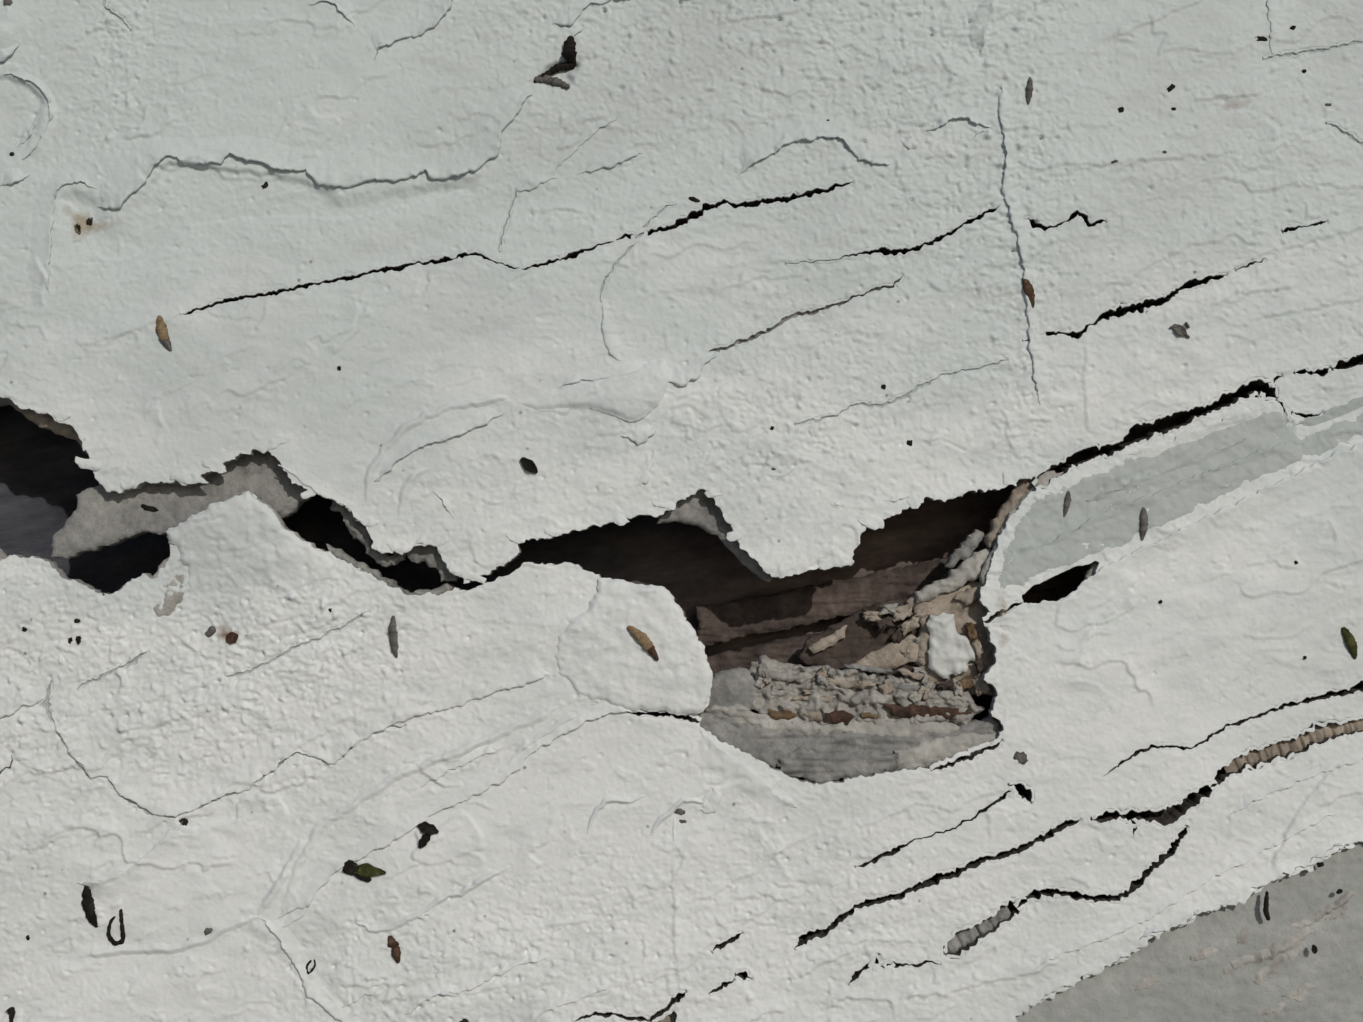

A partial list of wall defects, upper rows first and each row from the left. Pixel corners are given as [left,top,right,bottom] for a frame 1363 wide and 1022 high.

crack [180,179,853,318]
crack [706,204,1106,354]
crack [795,218,1328,427]
peeling [0,397,102,471]
peeling [170,457,227,484]
peeling [254,438,379,527]
peeling [651,487,797,583]
peeling [992,397,1363,632]
crack [1031,351,1363,489]
peeling [925,612,978,679]
crack [792,678,1363,986]
flaking render [996,830,1363,1022]